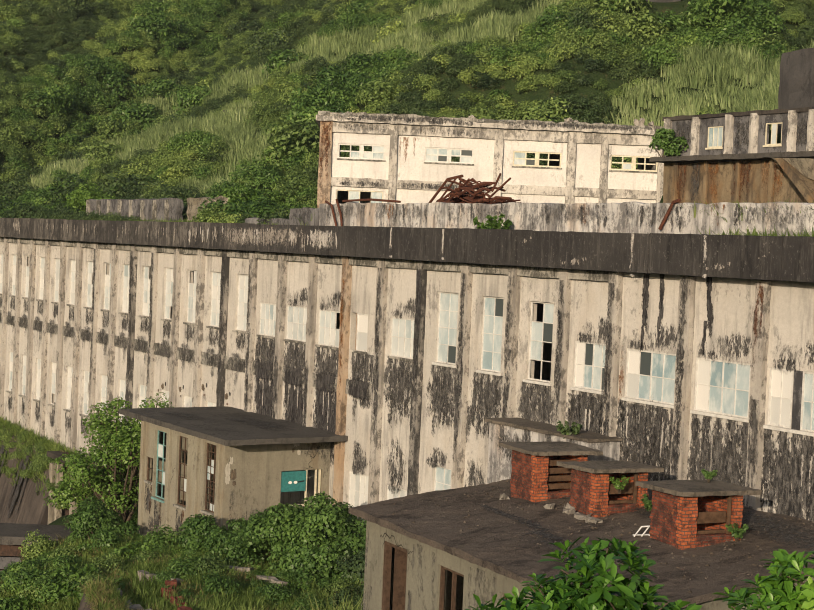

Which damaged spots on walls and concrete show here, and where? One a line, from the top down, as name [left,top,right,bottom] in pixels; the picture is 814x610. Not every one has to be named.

corrosion [319,121,331,187]
leakage [381,204,427,258]
leakage [532,204,607,232]
leakage [626,204,690,232]
leakage [729,204,814,231]
leakage [0,249,195,394]
leakage [202,257,339,471]
leakage [348,268,421,429]
leakage [426,273,531,468]
leakage [352,442,368,475]
leakage [387,439,406,494]
leakage [465,461,485,487]